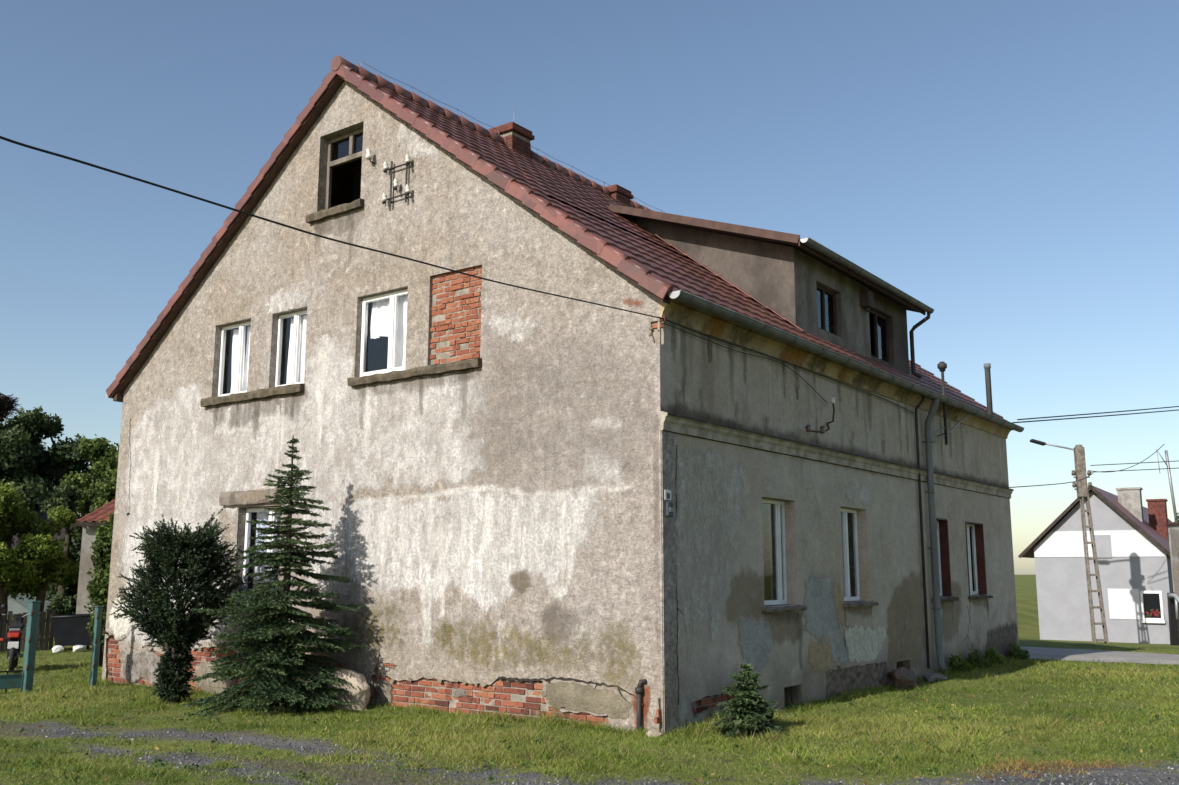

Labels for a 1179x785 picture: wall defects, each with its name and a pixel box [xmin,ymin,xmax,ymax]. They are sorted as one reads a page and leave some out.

peeling [105,334,622,693]
water stain [565,501,580,591]
water stain [510,571,528,590]
water stain [421,585,451,644]
flaking render [373,663,609,729]
crack [498,676,637,711]
flaking render [654,690,736,731]